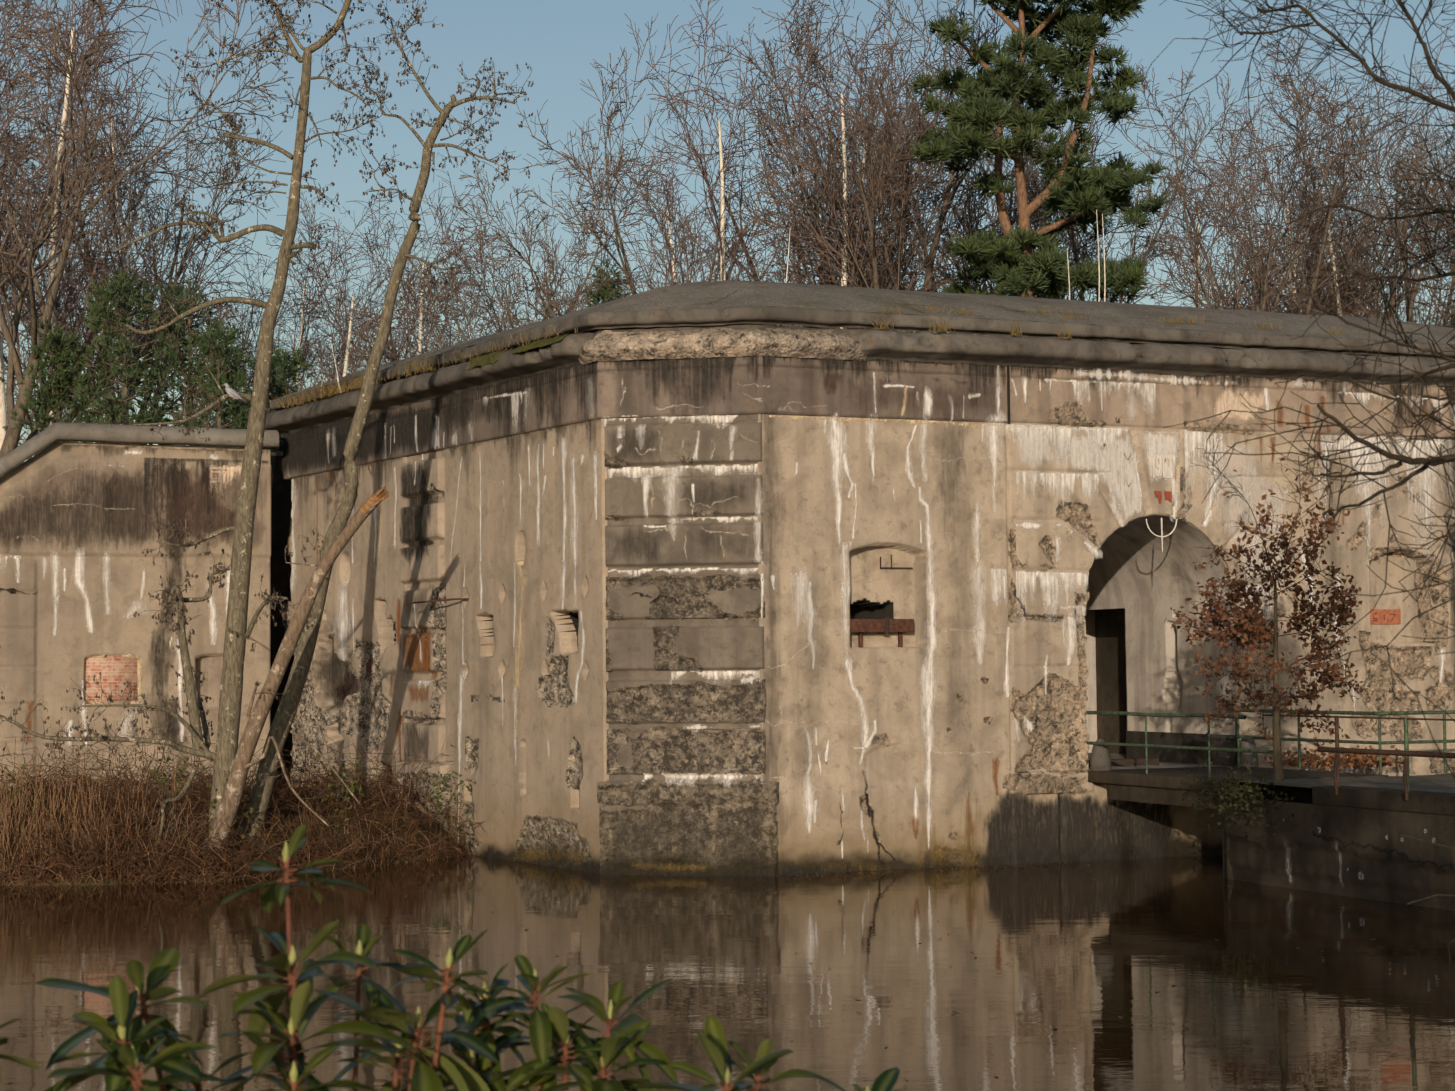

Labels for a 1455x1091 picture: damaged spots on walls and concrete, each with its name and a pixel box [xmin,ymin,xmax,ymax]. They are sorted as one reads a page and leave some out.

efflorescence [43,550,109,635]
spalling [290,583,447,773]
spalling [428,483,444,499]
spalling [513,574,779,876]
leakage [262,355,1455,868]
crack [837,659,895,866]
spalling [1003,528,1089,796]
spalling [1056,499,1101,548]